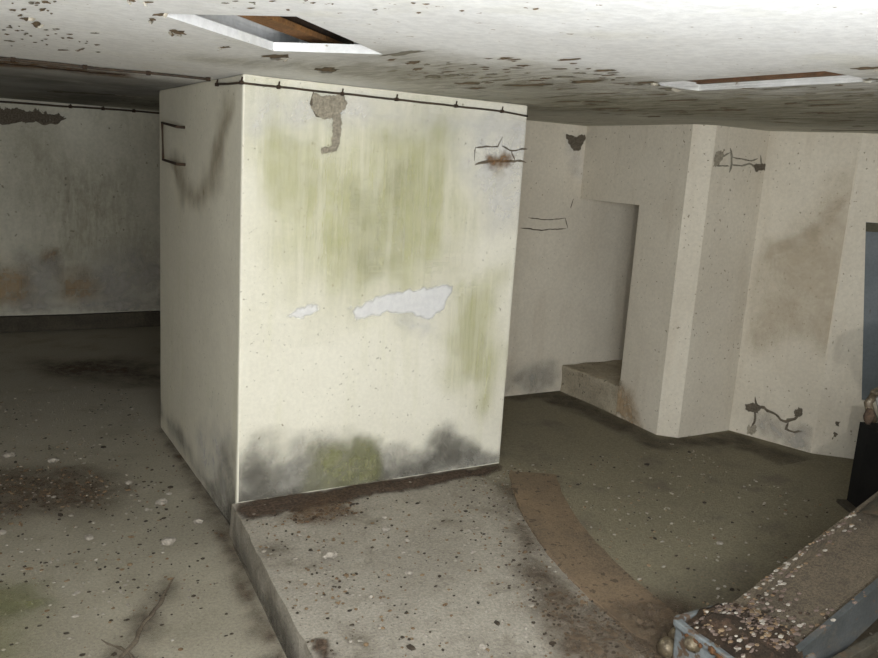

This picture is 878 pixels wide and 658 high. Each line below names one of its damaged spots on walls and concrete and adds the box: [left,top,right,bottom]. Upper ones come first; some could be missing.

peeling [3,1,100,53]
spalling [0,107,66,125]
peeling [382,50,747,117]
peeling [771,67,878,127]
peeling [354,285,451,319]
leakage [212,433,502,519]
crack [101,577,175,658]